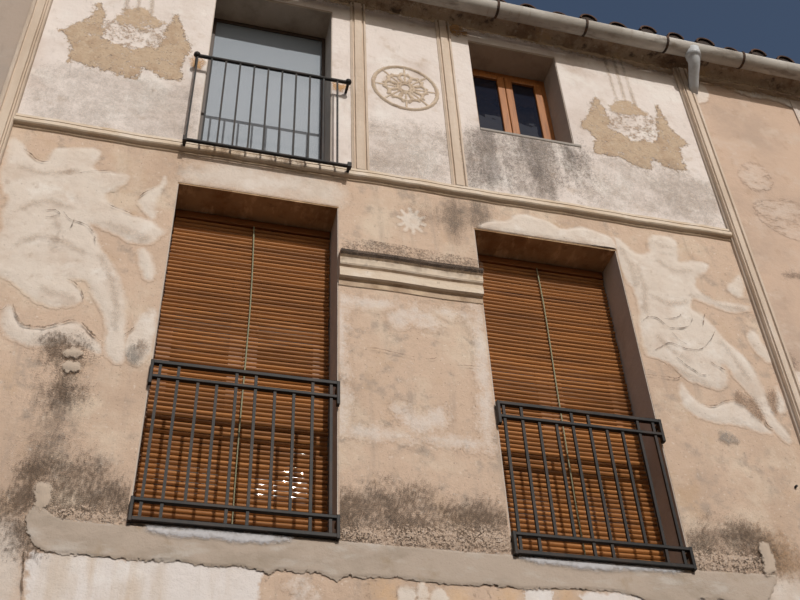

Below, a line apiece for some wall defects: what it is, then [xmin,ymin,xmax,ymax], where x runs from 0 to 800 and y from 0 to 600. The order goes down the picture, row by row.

peeling [59,2,192,82]
peeling [580,97,687,173]
crack [5,306,96,336]
leakage [37,332,92,408]
crack [646,314,725,379]
leakage [0,439,138,560]
leakage [340,477,512,554]
leakage [687,518,800,576]